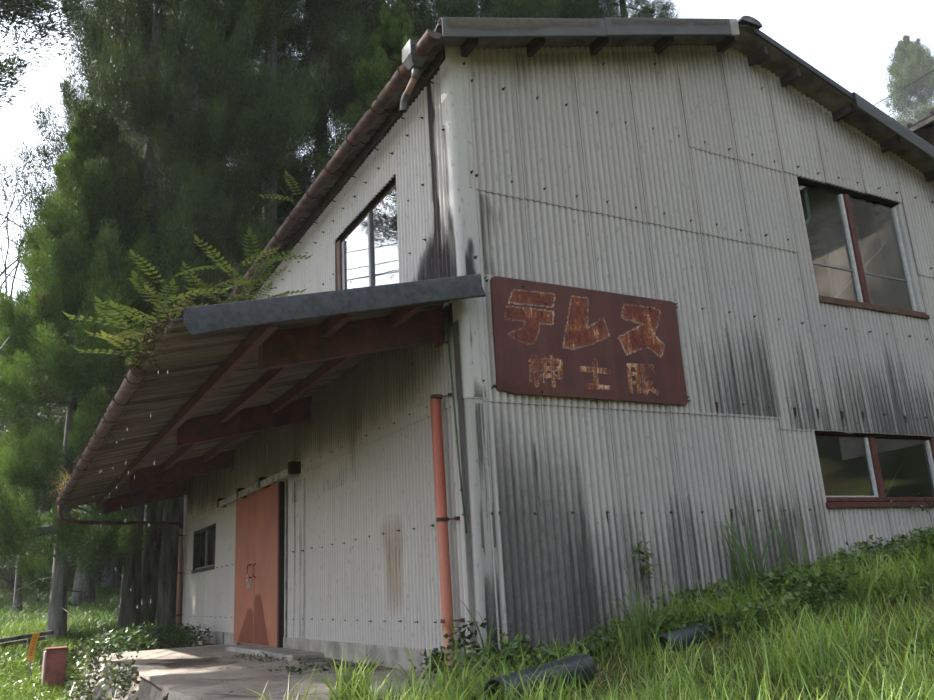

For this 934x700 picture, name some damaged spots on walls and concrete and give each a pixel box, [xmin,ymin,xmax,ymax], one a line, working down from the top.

leakage [418,82,500,281]
leakage [714,335,777,417]
leakage [787,353,934,436]
leakage [453,320,626,676]
leakage [630,503,734,616]
leakage [733,494,809,594]